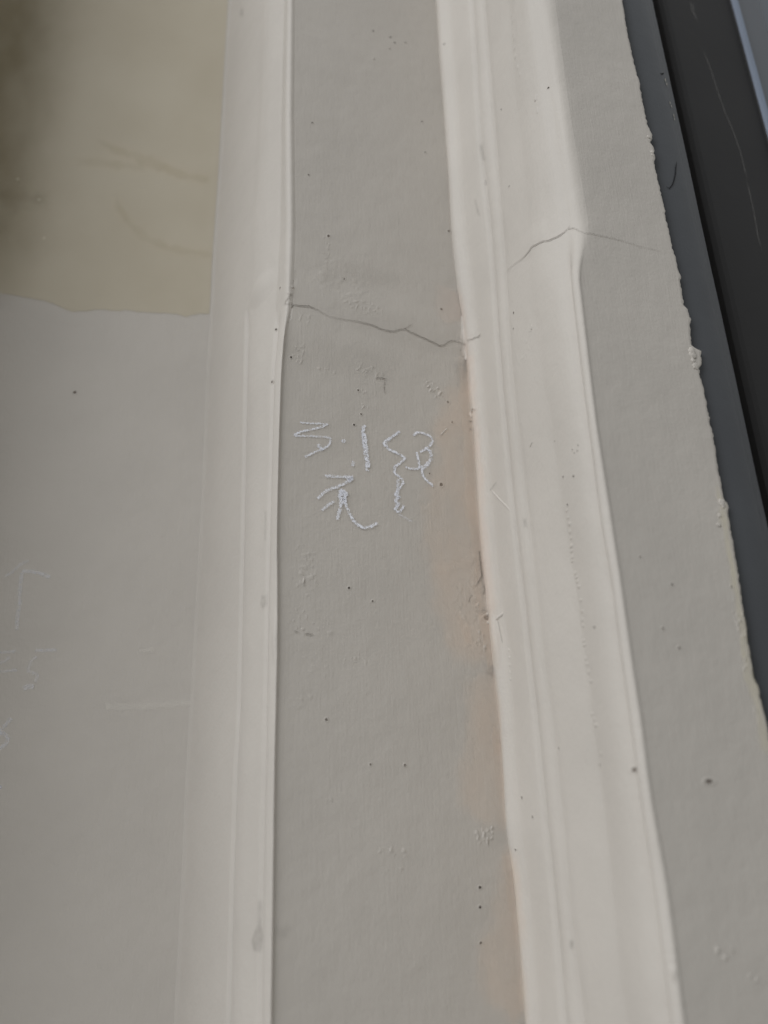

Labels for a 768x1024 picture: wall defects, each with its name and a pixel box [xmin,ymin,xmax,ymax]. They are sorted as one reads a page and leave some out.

crack [507,228,658,271]
crack [284,295,480,346]